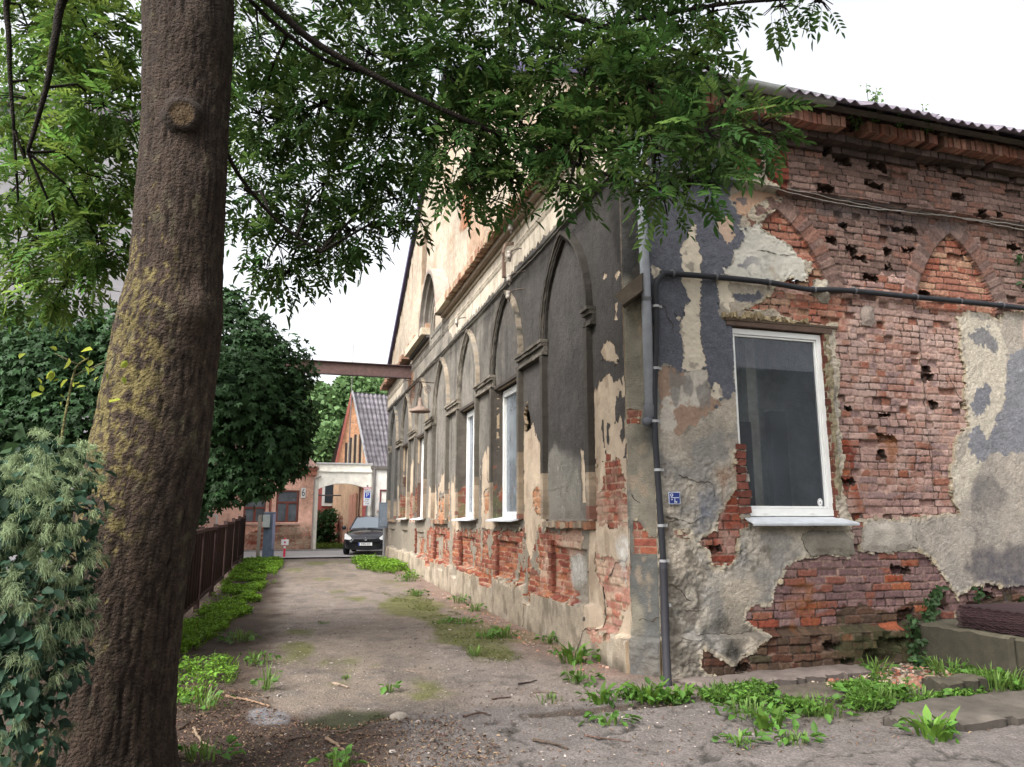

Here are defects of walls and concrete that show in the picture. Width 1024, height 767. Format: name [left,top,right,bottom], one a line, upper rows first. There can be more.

flaking render [761,99,1024,150]
peeling [398,340,659,648]
peeling [658,224,723,437]
flaking render [674,489,748,566]
flaking render [701,146,1024,676]